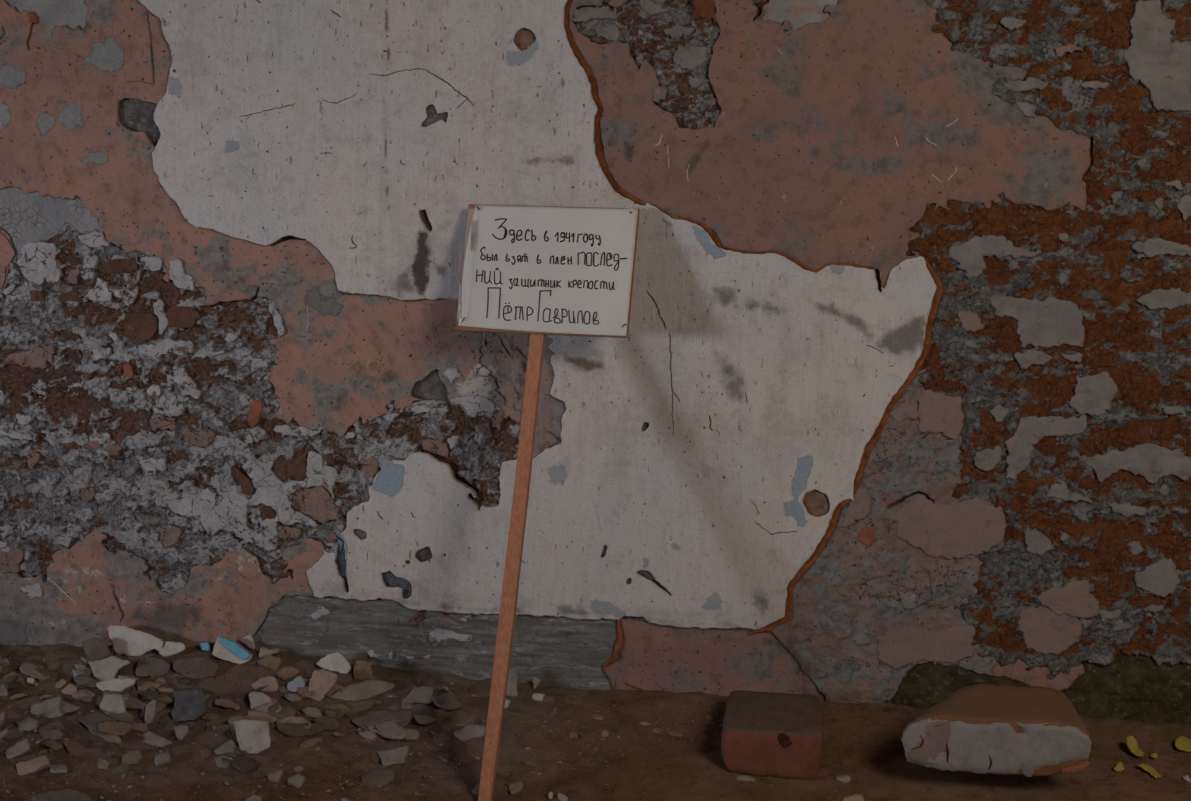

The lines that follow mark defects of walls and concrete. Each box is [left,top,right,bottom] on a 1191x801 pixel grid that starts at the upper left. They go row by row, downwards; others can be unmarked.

spalling [0,0,530,788]
crack [240,104,294,120]
crack [323,68,474,109]
spalling [504,0,1191,725]